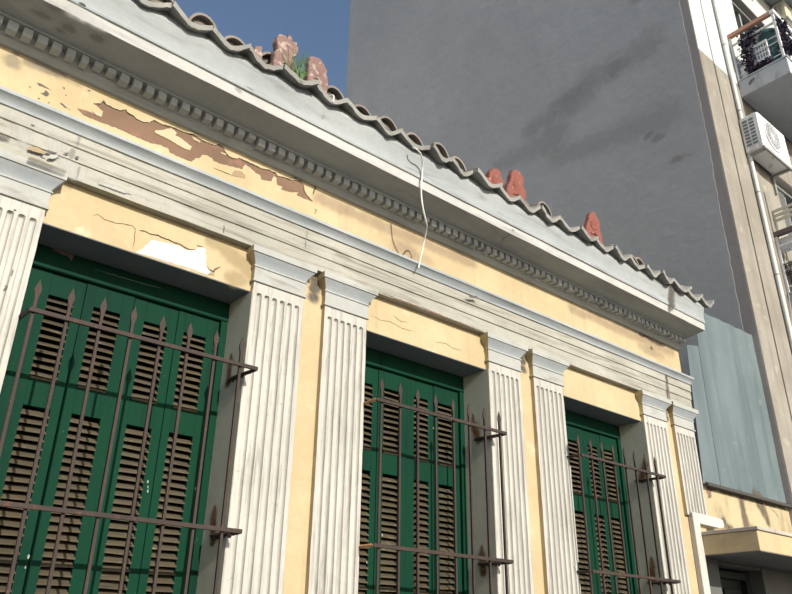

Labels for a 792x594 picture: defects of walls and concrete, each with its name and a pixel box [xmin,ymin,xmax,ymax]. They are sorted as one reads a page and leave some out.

spalling [28,147,79,159]
peeling [77,99,313,201]
peeling [133,230,219,276]